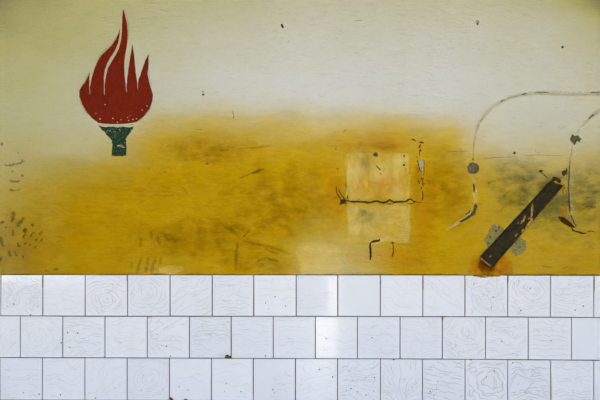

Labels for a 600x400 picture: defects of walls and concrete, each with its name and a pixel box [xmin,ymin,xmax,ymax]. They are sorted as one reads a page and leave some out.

crack [336,142,425,205]